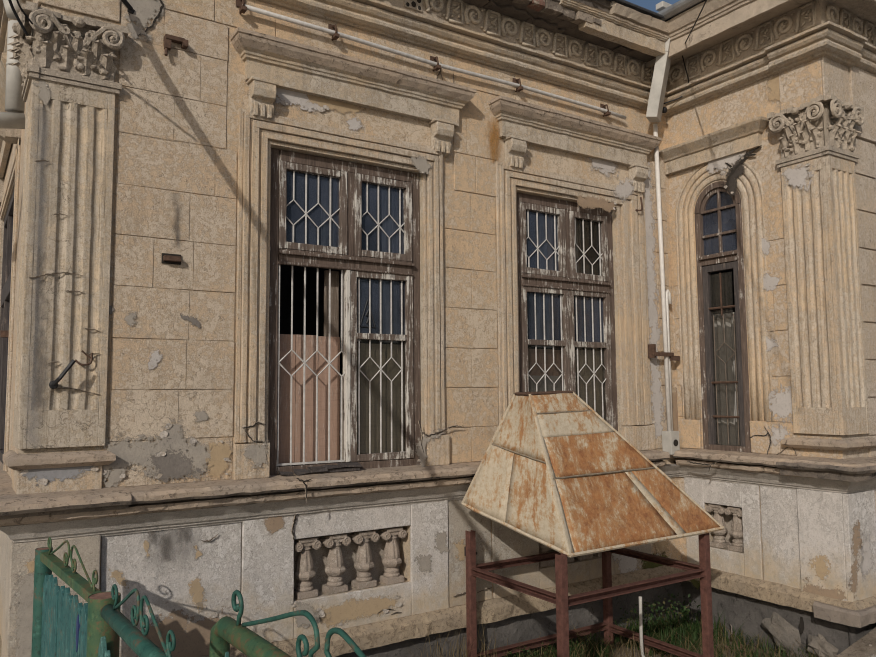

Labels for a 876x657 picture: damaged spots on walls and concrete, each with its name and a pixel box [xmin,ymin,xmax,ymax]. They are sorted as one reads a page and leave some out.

peeling [123,0,167,43]
flaking render [508,0,602,26]
peeling [275,87,366,131]
peeling [576,157,666,444]
peeling [20,416,211,488]
peeling [223,440,268,470]
crack [418,421,464,453]
peeling [803,520,874,601]